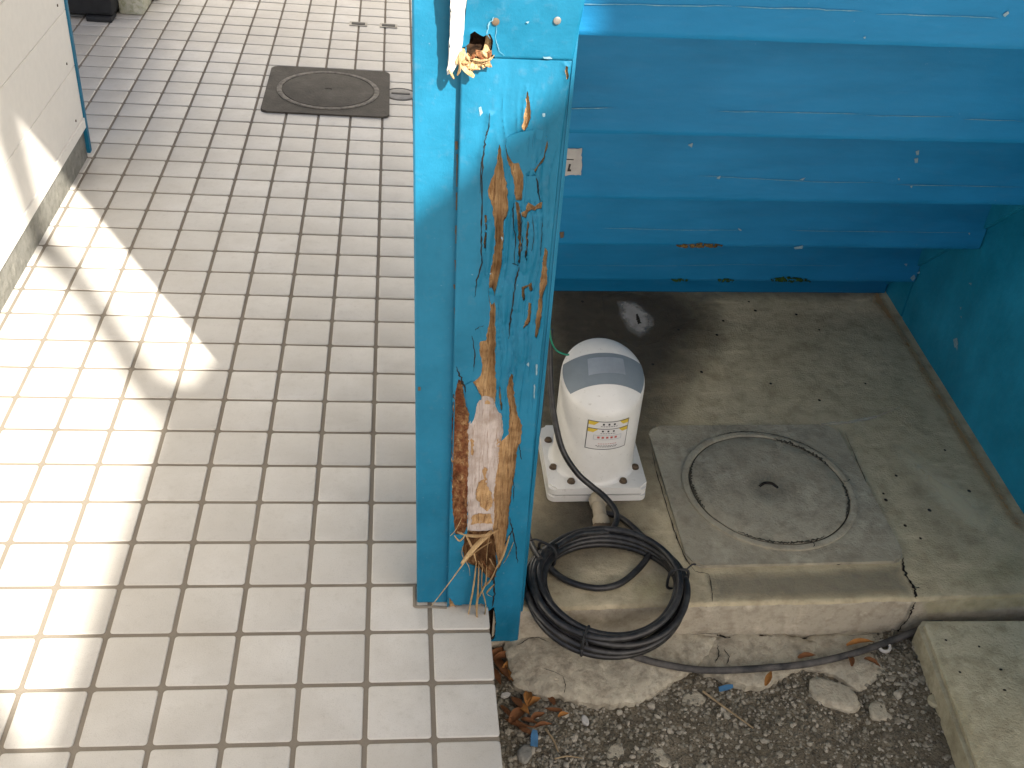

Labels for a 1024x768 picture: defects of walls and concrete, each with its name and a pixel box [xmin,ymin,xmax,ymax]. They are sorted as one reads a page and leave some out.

peeling [505,91,548,262]
peeling [522,248,548,337]
peeling [466,381,481,423]
spalling [432,518,514,617]
crack [848,558,919,636]